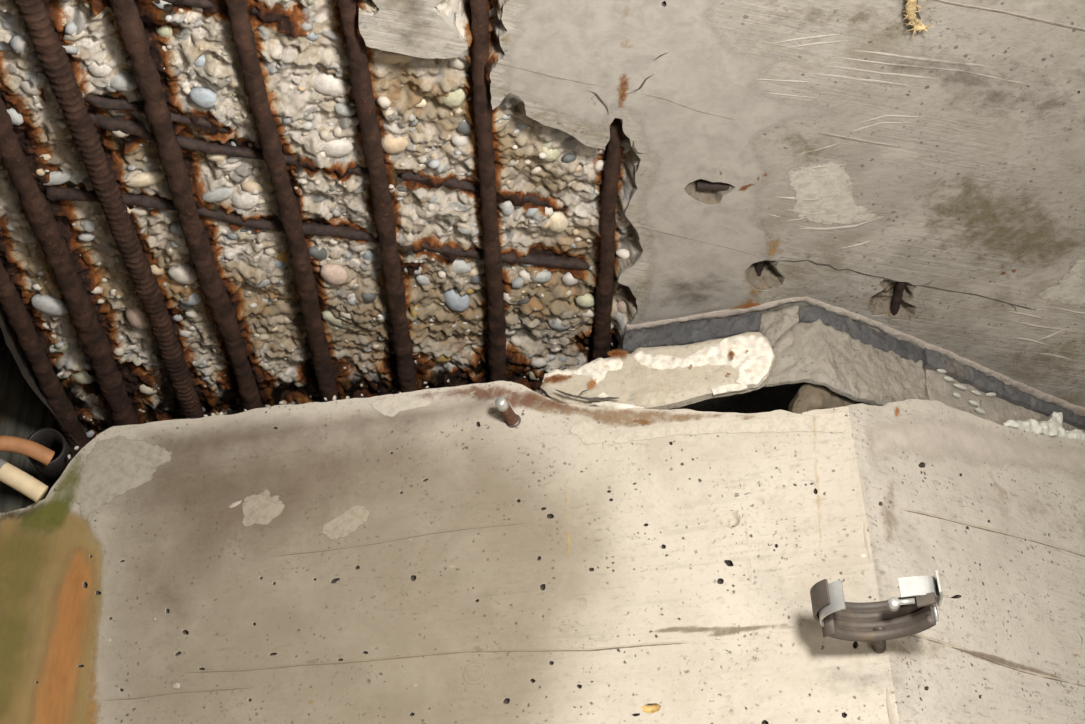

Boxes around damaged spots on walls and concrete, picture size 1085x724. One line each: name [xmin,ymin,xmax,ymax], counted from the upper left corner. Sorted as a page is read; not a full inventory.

rust [64,369,113,439]
rust [0,0,243,424]
spalling [0,0,243,449]
rust [134,0,319,408]
spalling [152,0,322,407]
rust [246,0,401,400]
spalling [252,0,400,400]
spalling [370,0,490,390]
rust [356,0,628,409]
spalling [490,93,720,426]
spalling [745,260,784,290]
spalling [868,279,916,320]